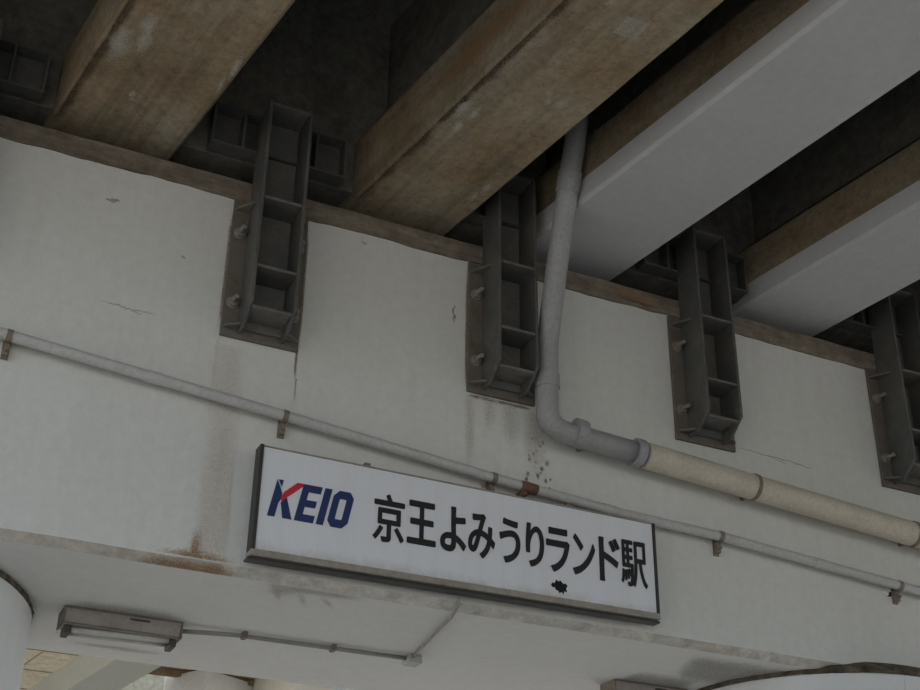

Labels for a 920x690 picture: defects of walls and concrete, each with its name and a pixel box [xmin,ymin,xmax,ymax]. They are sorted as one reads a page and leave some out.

corrosion [137,527,237,577]